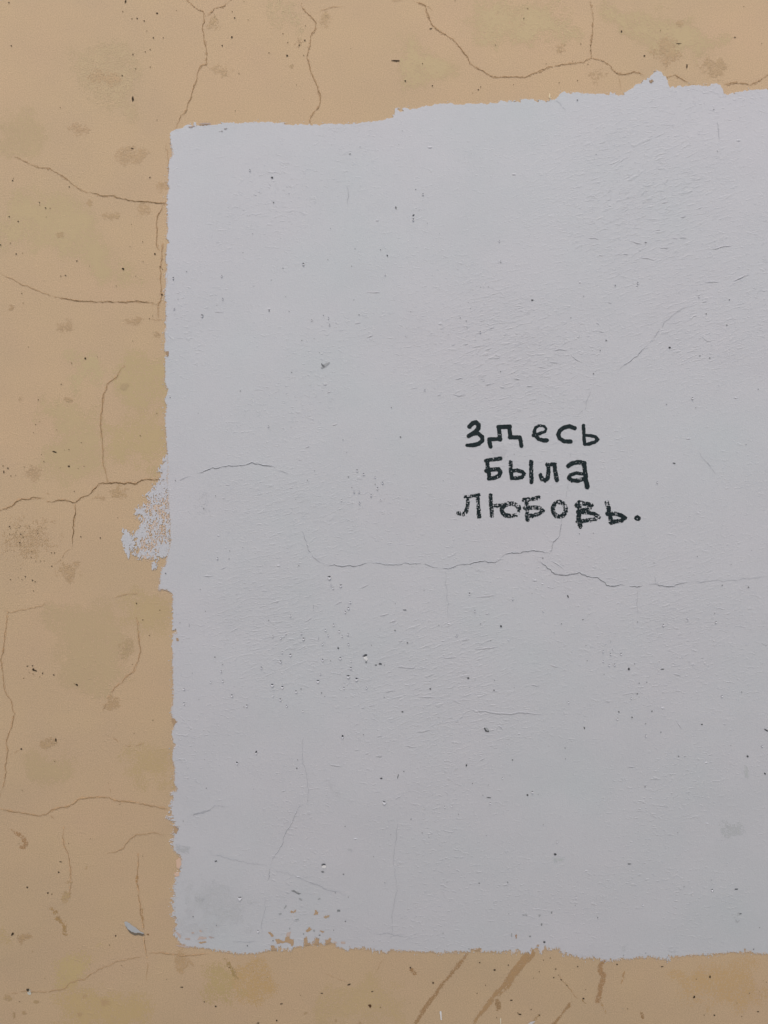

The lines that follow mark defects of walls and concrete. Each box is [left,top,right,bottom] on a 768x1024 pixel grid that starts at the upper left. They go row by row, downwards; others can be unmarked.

crack [301,3,342,123]
crack [393,0,694,85]
crack [4,155,167,321]
crack [0,366,288,543]
crack [303,523,759,613]
crack [0,593,206,994]
peeling [257,890,346,951]
water stain [473,950,535,1024]